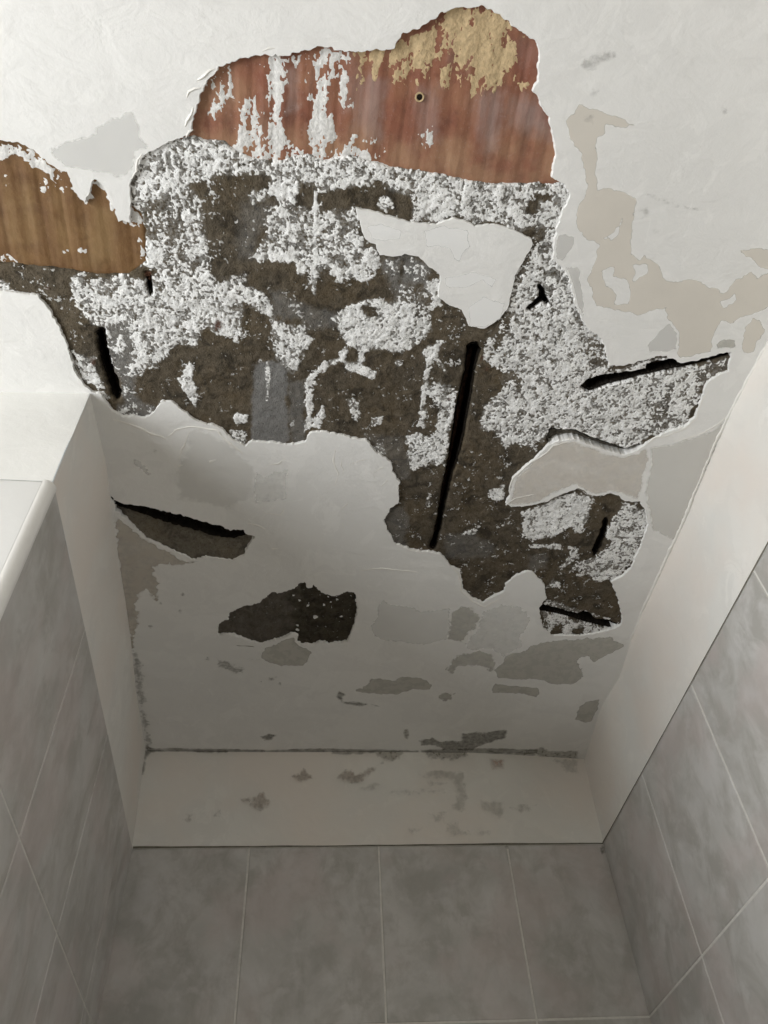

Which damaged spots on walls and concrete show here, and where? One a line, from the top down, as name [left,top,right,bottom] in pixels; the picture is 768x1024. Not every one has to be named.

crack [61,327,121,398]
crack [111,497,246,538]
spalling [0,68,768,697]
crack [430,341,480,549]
crack [581,352,729,390]
crack [133,542,768,849]